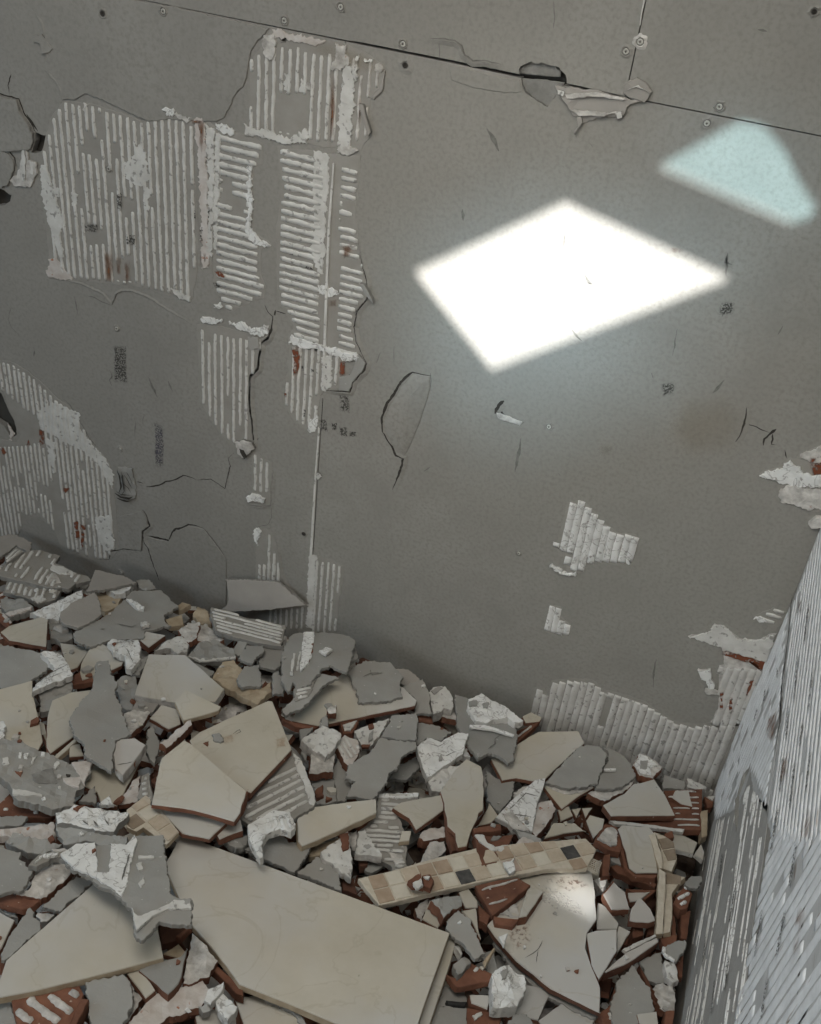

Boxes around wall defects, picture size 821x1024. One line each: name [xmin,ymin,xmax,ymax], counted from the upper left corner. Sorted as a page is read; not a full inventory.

peeling [28,0,289,122]
crack [248,304,285,444]
crack [381,372,431,492]
crack [107,459,231,584]
peeling [698,668,718,695]